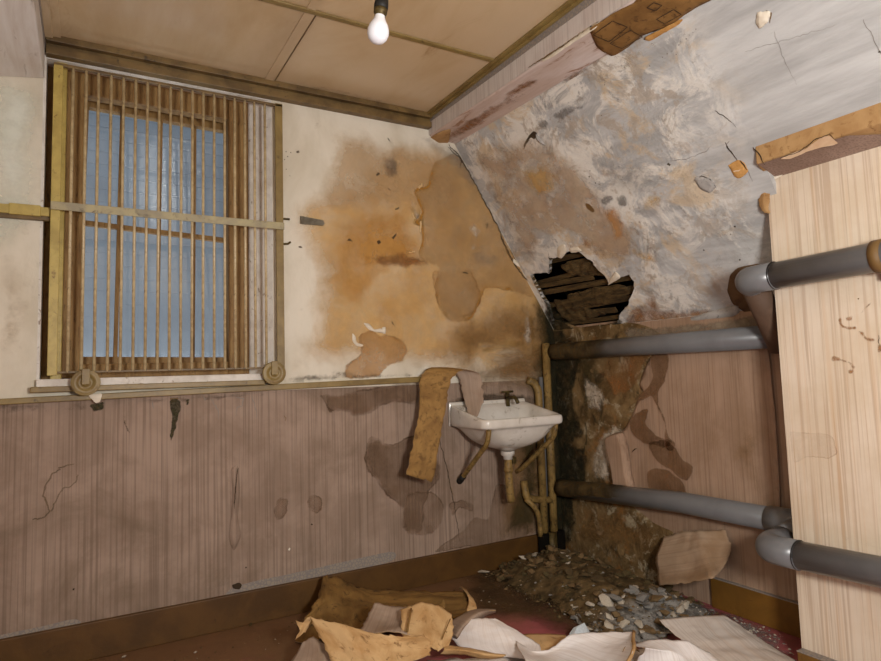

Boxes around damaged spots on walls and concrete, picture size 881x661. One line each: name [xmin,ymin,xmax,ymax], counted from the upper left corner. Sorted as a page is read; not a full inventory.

peeling [756,10,772,29]
water stain [485,150,629,253]
water stain [308,147,574,414]
spalling [531,244,652,344]
peeling [345,322,407,378]
water stain [170,397,189,439]
spalling [555,355,653,484]
water stain [630,354,693,492]
water stain [364,436,461,531]
water stain [507,431,563,531]
spalling [561,497,674,588]